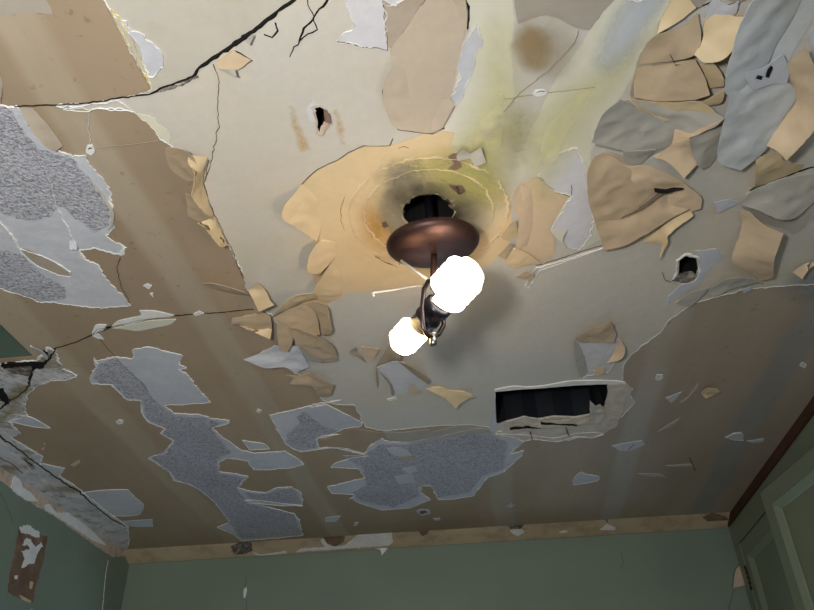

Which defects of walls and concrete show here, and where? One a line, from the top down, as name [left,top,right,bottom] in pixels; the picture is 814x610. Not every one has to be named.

crack [49,258,253,391]
crack [14,0,329,179]
peeling [0,0,470,373]
peeling [270,0,814,510]
crack [750,167,814,191]
spalling [0,345,153,551]
peeling [89,346,304,556]
spalling [7,525,48,610]
peeling [296,533,393,556]